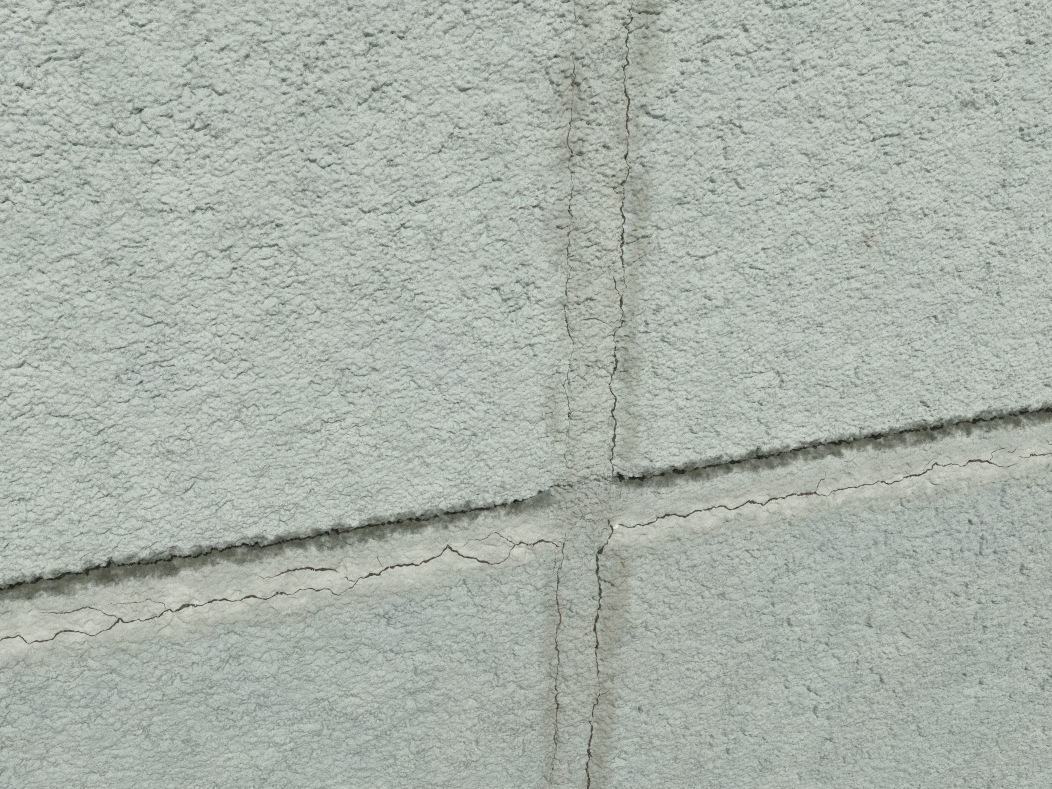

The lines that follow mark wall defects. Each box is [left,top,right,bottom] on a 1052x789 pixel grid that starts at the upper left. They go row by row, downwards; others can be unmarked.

crack [563,3,633,497]
crack [0,439,1052,789]